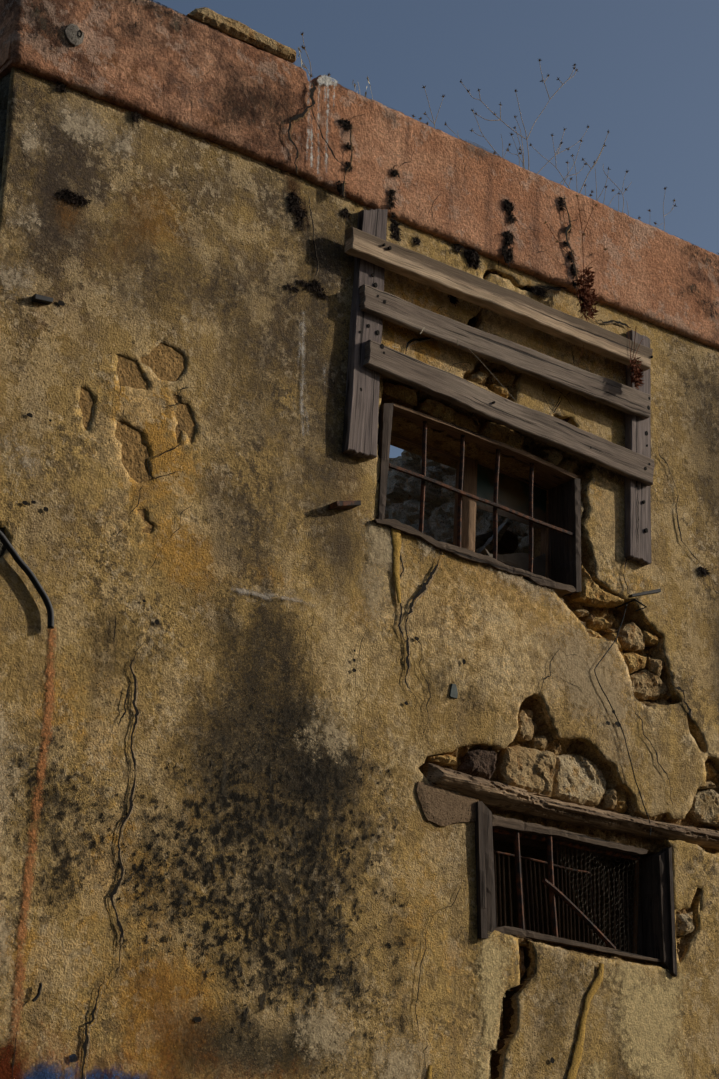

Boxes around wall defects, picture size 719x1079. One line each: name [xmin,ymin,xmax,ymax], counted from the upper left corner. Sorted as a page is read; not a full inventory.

crack [288,80,365,201]
spalling [380,375,594,519]
crack [391,528,443,743]
spalling [559,534,675,707]
corrosion [10,627,56,1049]
crack [81,617,147,1079]
water stain [0,589,430,1079]
spalling [419,696,719,831]
spalling [487,807,668,855]
crack [567,963,604,1079]
spalling [512,935,660,967]